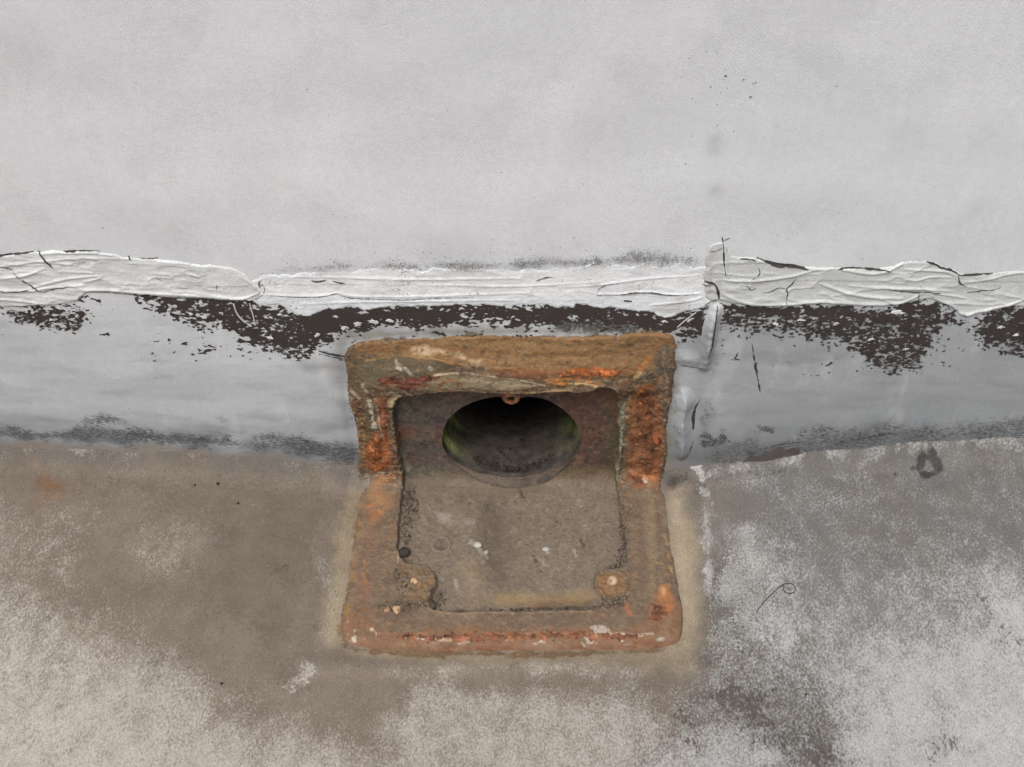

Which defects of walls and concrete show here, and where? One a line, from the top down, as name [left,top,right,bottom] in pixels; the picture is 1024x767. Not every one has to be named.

crack [0,250,94,293]
crack [103,256,229,301]
crack [838,261,1001,300]
peeling [0,295,101,335]
peeling [134,294,1024,376]
crack [597,237,809,392]
rust [552,366,623,387]
rust [364,373,432,472]
rust [628,387,665,474]
leakage [897,442,942,478]
rust [645,603,669,623]
rust [339,623,664,658]